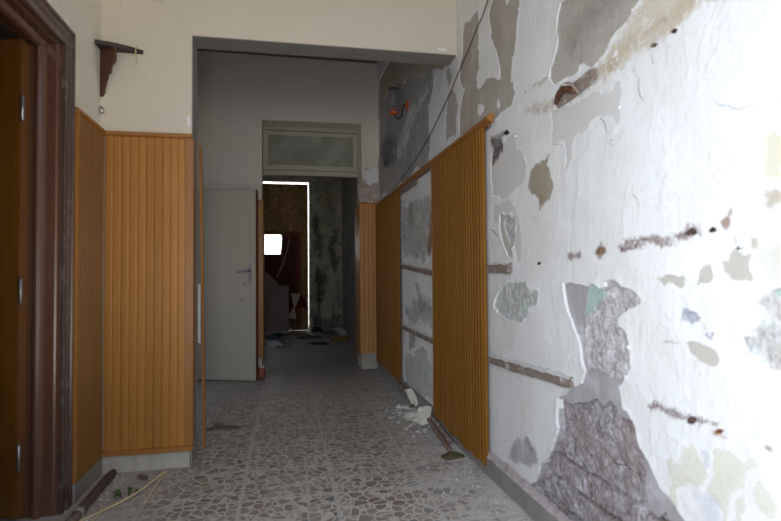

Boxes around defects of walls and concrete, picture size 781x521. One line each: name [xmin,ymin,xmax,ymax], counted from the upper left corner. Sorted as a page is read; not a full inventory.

peeling [550,0,639,84]
water stain [383,83,429,161]
peeling [358,0,520,202]
peeling [761,131,781,180]
peeling [491,134,526,263]
water stain [314,218,338,303]
flaking render [493,281,538,322]
flaking render [736,289,781,370]
flaking render [533,280,685,521]